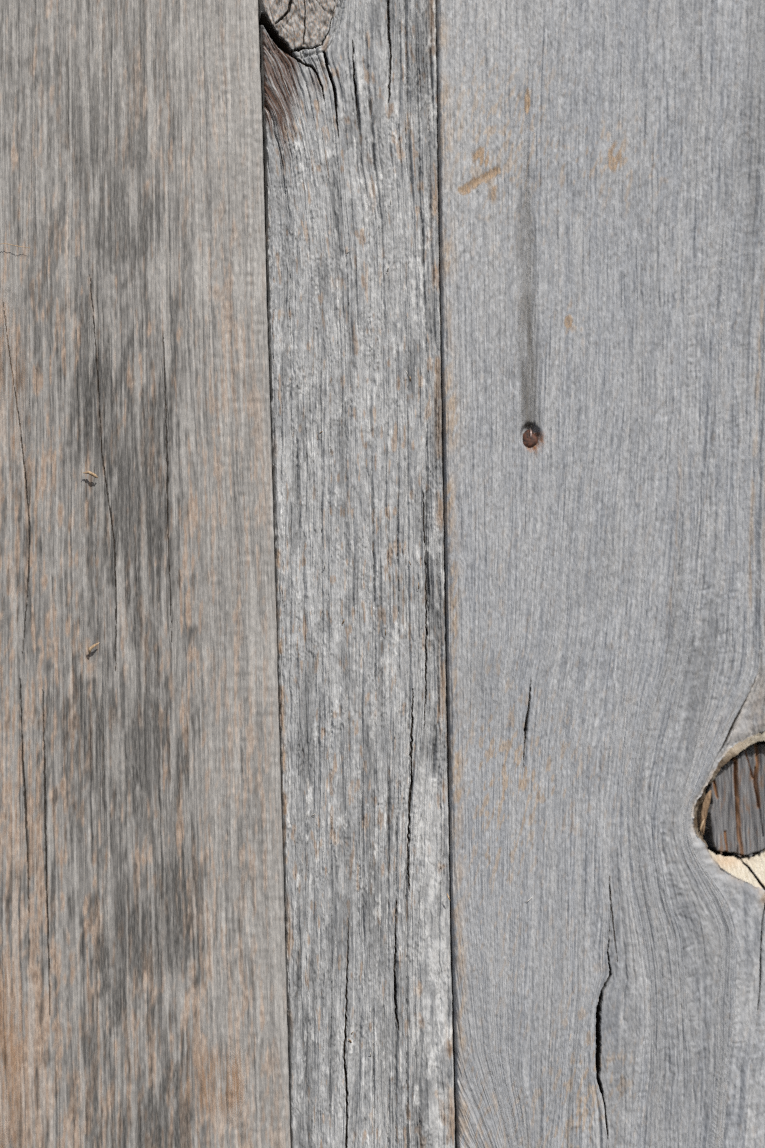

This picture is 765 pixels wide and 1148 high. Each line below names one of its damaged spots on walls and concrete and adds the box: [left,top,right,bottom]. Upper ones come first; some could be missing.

crack [595,876,618,1139]